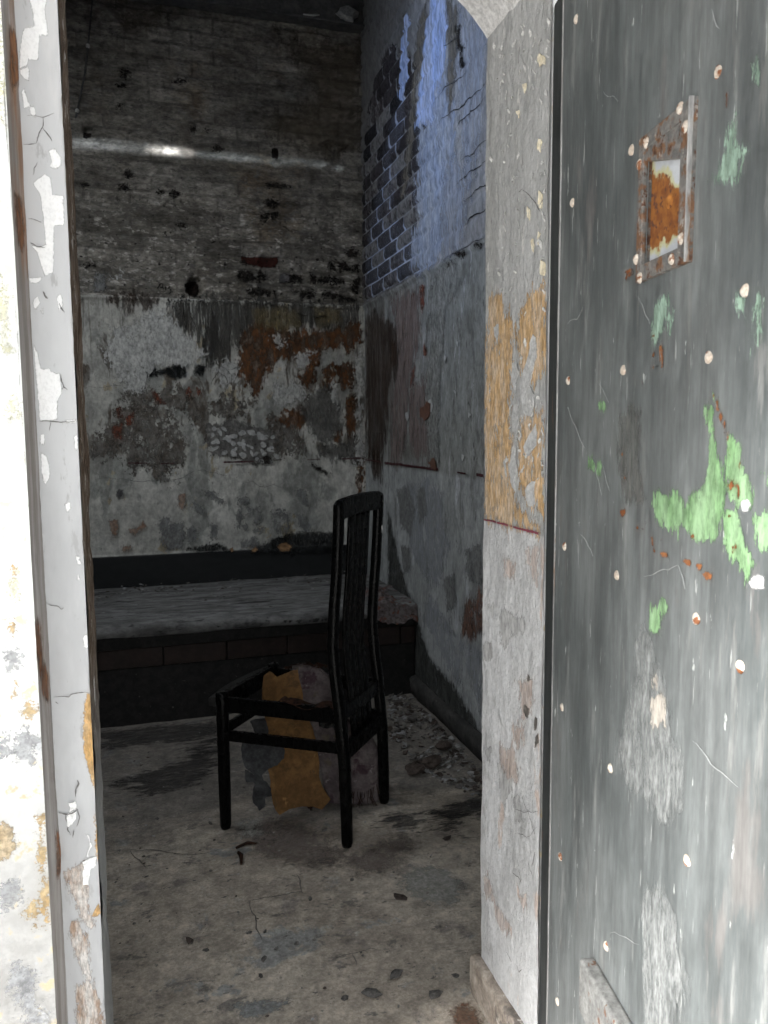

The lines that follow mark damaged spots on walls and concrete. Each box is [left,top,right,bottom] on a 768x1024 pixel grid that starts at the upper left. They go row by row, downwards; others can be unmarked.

peeling [19,0,48,116]
crack [23,113,54,175]
peeling [29,149,64,283]
leakage [106,0,487,372]
flaking render [236,42,427,304]
crack [434,72,486,128]
crack [445,140,486,259]
peeling [33,306,332,552]
corrosion [234,309,415,493]
peeling [468,139,547,544]
peeling [83,694,95,788]
peeling [64,821,106,1024]